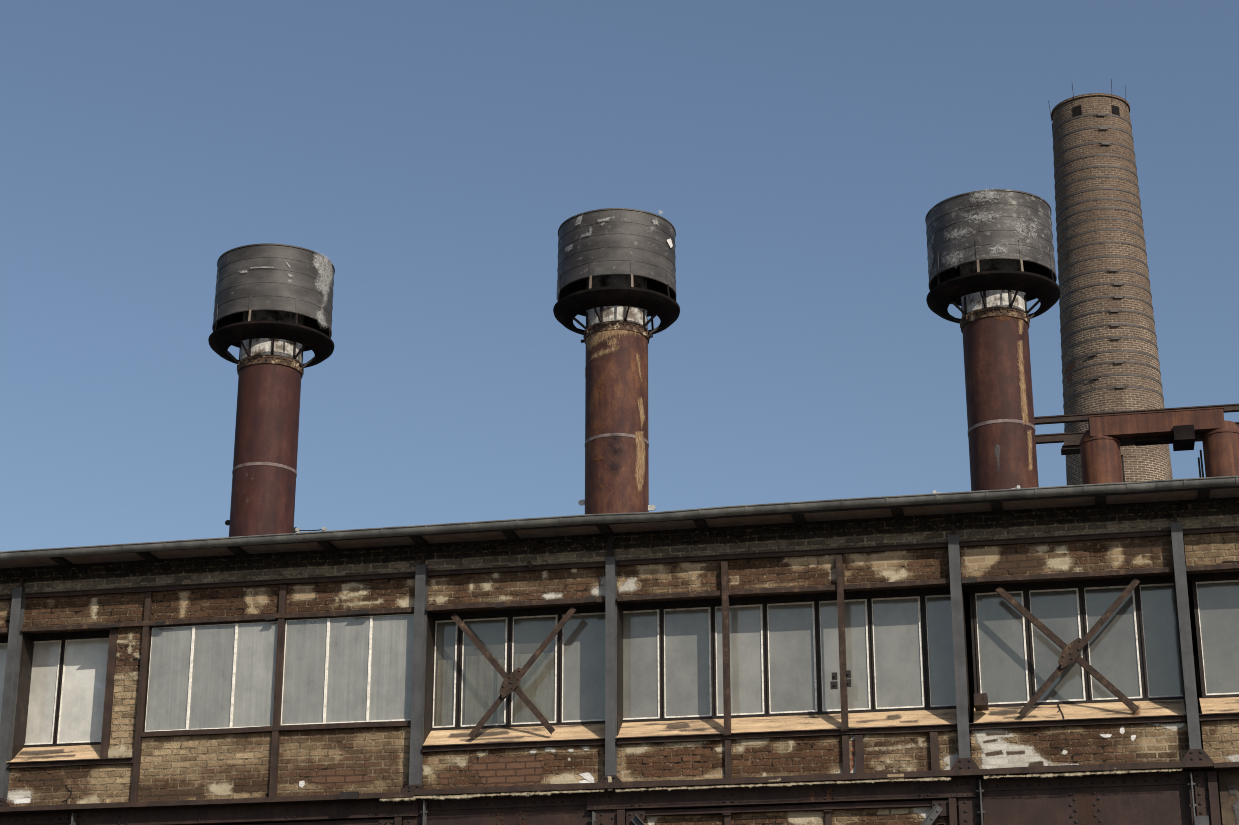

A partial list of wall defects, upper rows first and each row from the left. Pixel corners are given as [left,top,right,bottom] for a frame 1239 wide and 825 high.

corrosion [585,330,639,377]
corrosion [997,316,1032,470]
corrosion [635,397,645,491]
peeling [782,551,906,570]
peeling [963,546,1000,571]
peeling [1035,546,1082,572]
peeling [591,562,707,596]
peeling [244,588,268,614]
peeling [293,586,315,600]
peeling [335,583,384,610]
peeling [974,729,1181,779]